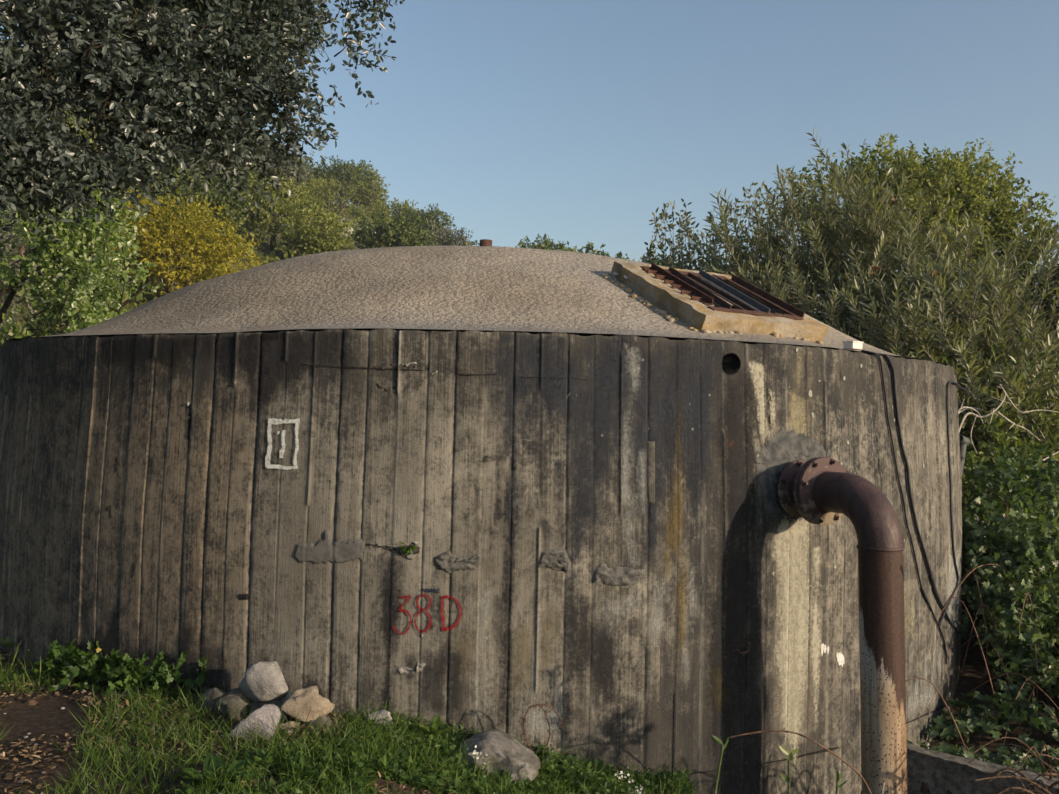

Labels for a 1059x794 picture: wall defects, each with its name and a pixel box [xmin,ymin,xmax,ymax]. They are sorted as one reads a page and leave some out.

damp [483,335,776,794]
damp [772,516,845,765]